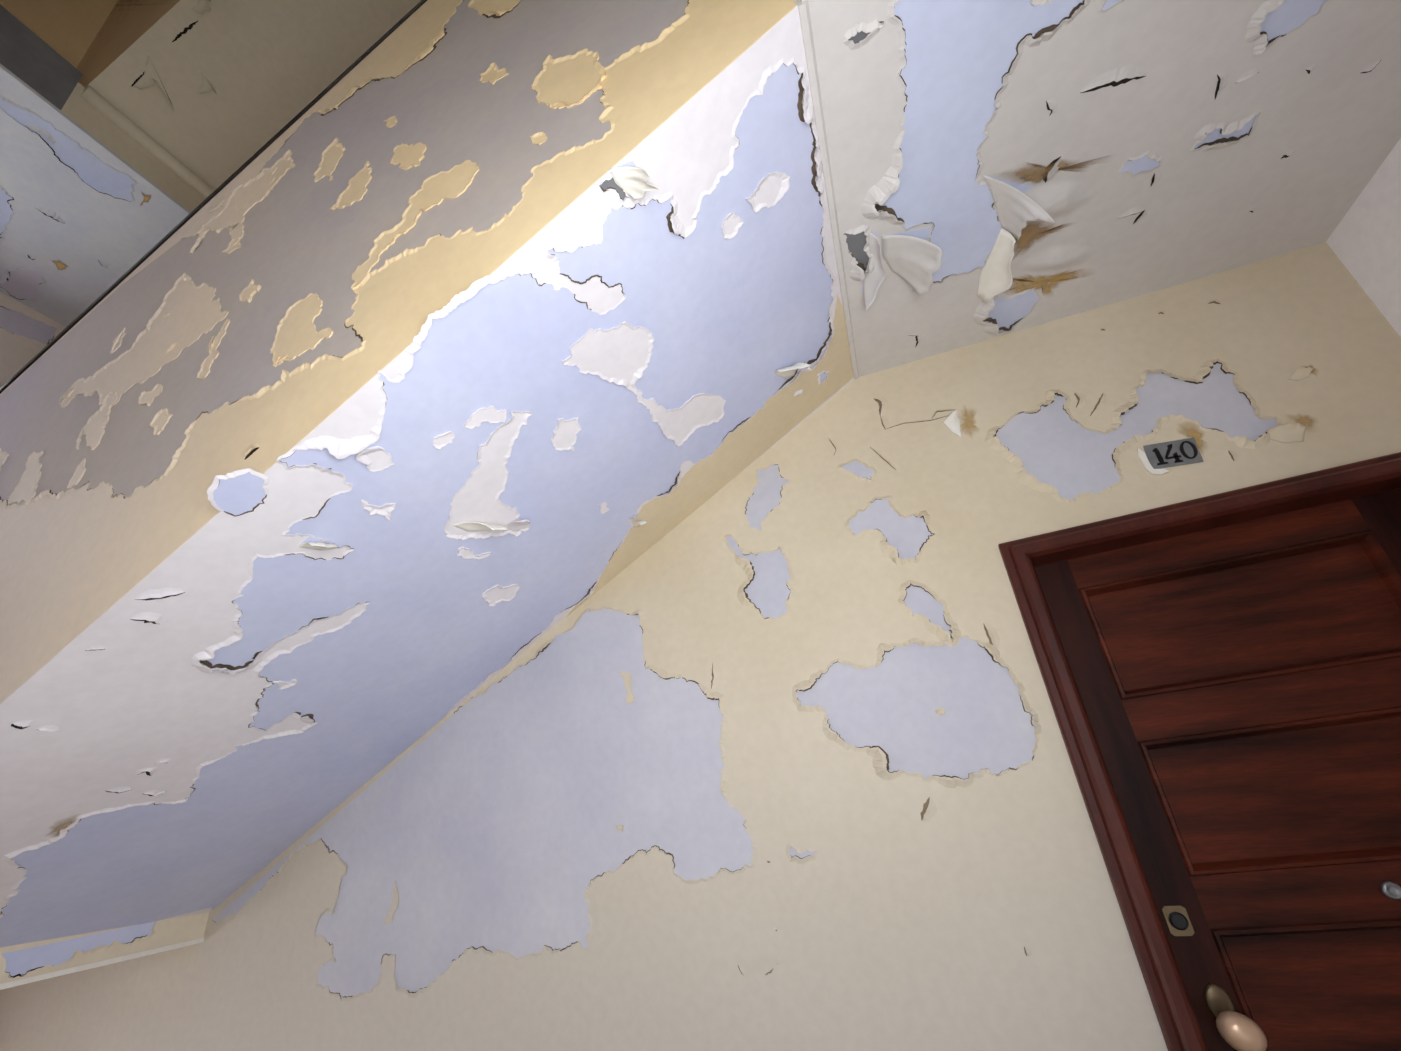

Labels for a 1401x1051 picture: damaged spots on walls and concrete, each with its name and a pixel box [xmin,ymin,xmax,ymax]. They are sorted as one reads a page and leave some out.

peeling [1245,0,1329,57]
peeling [1190,111,1262,152]
peeling [0,0,1125,1002]
peeling [985,358,1308,504]